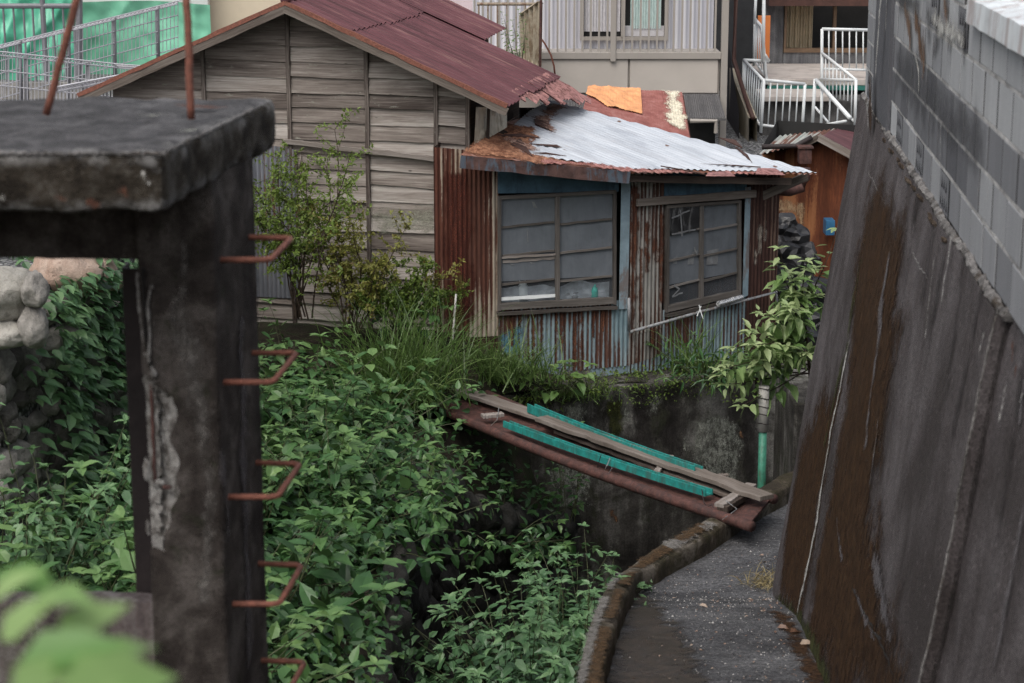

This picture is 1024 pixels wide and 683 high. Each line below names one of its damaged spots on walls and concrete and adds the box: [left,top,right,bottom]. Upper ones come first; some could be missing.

rust [444,172,475,327]
rust [465,103,692,351]
spalling [142,370,179,551]
water stain [603,386,683,458]
water stain [742,395,759,483]
water stain [767,165,1024,683]